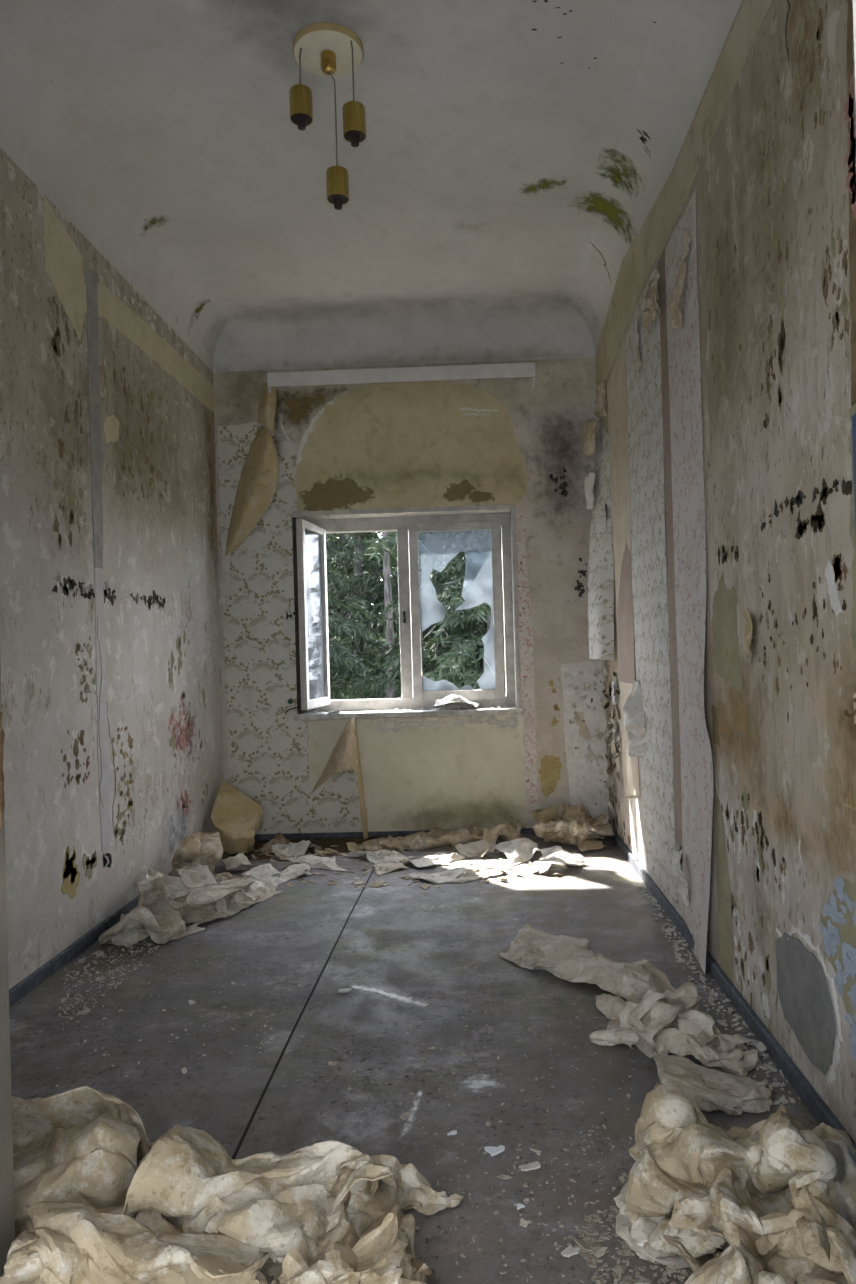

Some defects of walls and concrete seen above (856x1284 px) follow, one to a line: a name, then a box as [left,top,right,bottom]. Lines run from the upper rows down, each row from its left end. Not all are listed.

peeling [759,0,856,696]
peeling [219,381,528,605]
spalling [712,544,742,691]
peeling [308,675,562,832]